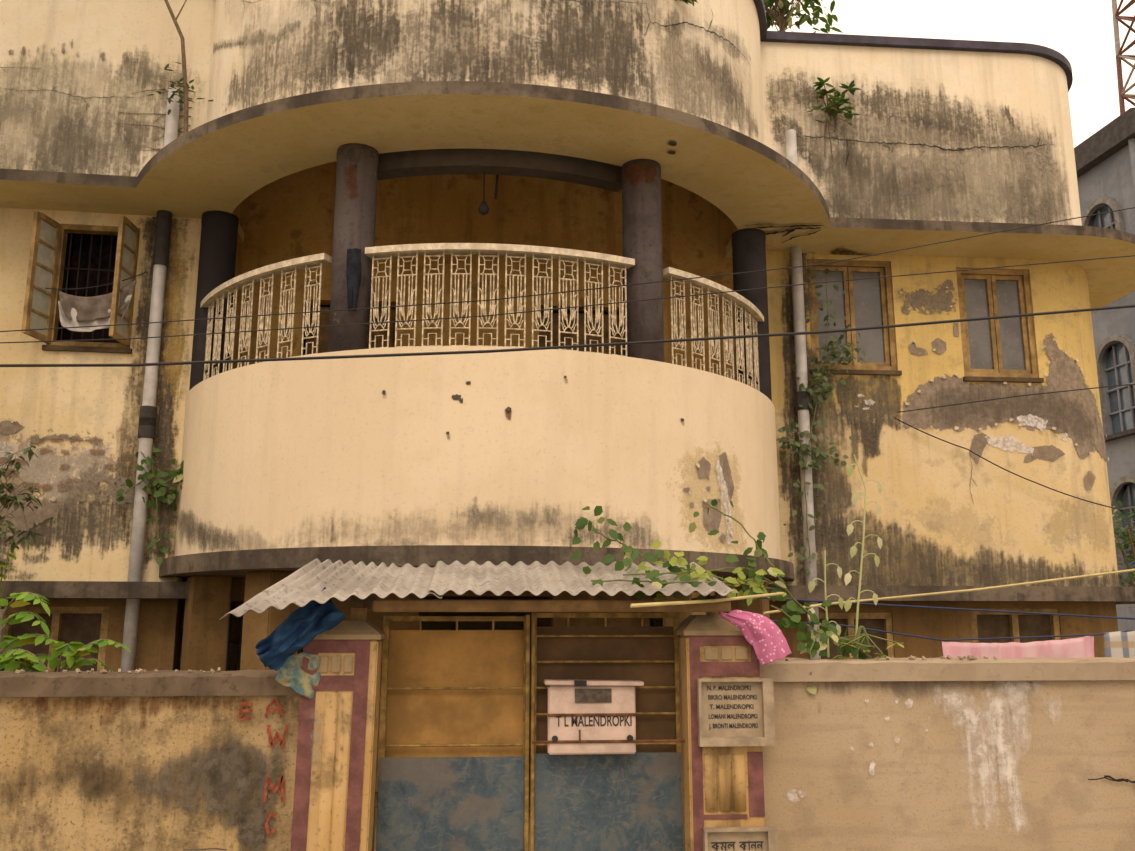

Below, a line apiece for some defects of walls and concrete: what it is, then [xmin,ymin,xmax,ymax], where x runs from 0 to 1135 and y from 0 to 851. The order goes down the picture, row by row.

leakage [0,42,100,174]
leakage [298,0,823,169]
crack [797,116,1051,167]
leakage [846,95,1069,224]
peeling [899,279,959,356]
spalling [0,419,135,534]
peeling [683,452,734,544]
leakage [781,253,1121,587]
spalling [902,333,1109,490]
leakage [52,738,285,851]
efflorescence [944,693,1025,829]
crack [1088,775,1135,784]